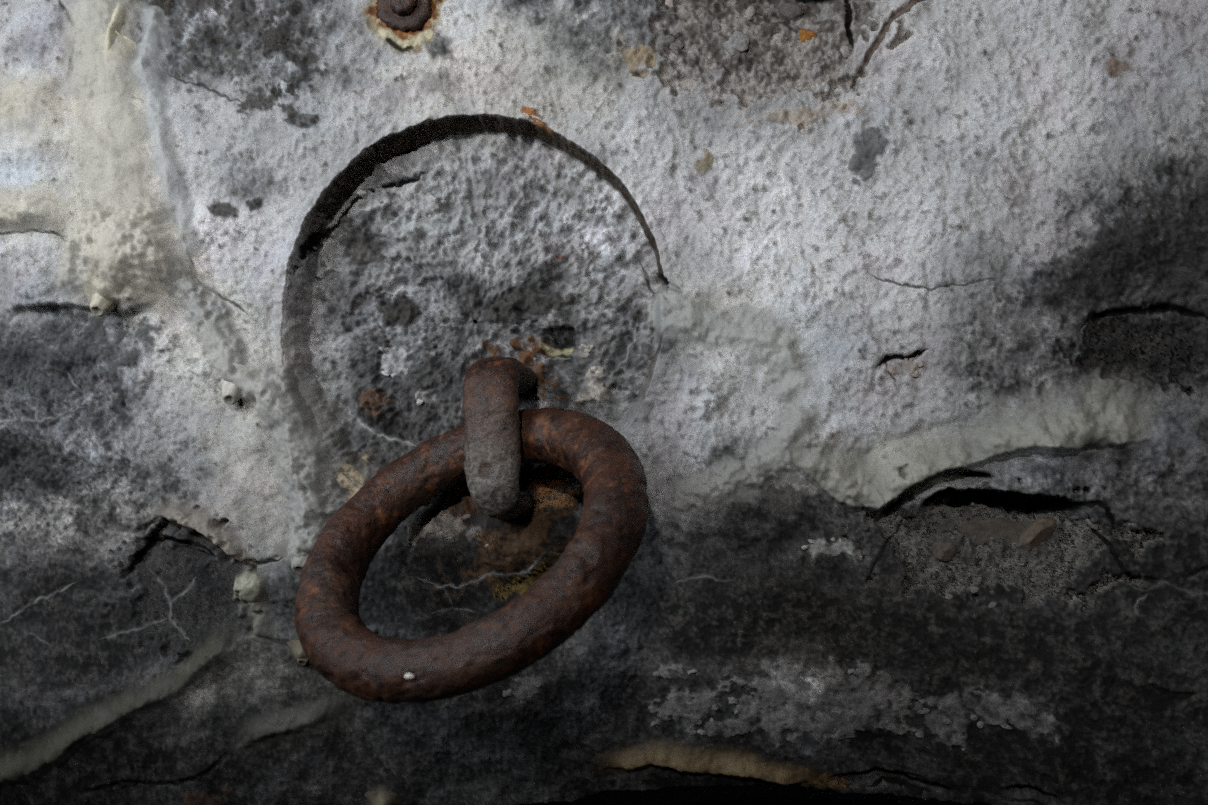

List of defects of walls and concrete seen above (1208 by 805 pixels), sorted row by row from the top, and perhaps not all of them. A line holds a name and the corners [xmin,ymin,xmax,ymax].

corrosion [365,0,444,52]
spalling [636,0,913,107]
crack [844,0,922,89]
crack [290,168,433,279]
leakage [0,302,161,403]
corrosion [482,337,563,407]
crack [1079,303,1208,330]
leakage [0,433,75,492]
corrosion [338,458,368,499]
crack [125,516,282,577]
corrosion [431,464,582,601]
spalling [801,470,1165,614]